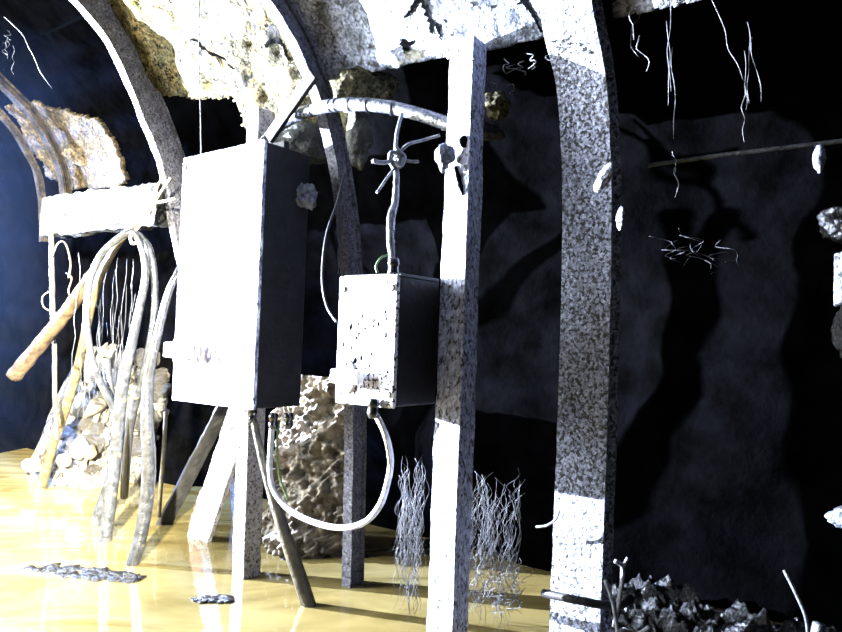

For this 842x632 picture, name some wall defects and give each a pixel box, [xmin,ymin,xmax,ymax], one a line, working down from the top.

crack [399,0,442,58]
crack [516,0,543,33]